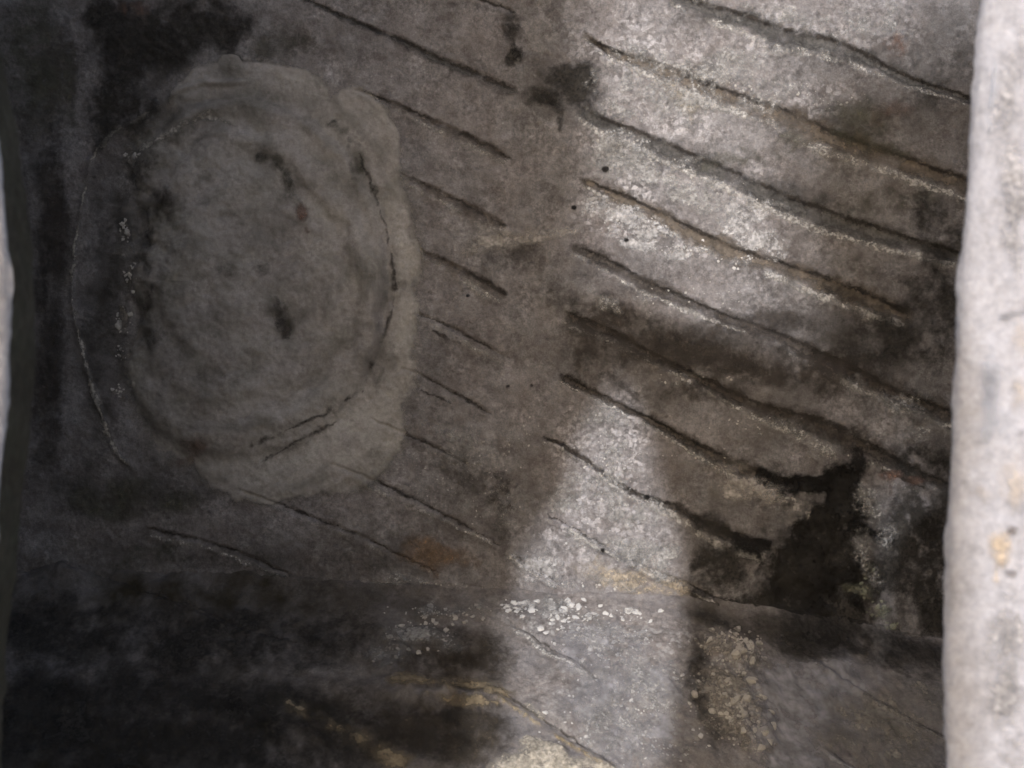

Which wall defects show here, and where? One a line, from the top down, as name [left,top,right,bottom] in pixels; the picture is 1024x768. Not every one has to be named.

leakage [2,0,76,462]
leakage [83,0,272,149]
leakage [505,15,522,66]
leakage [530,62,632,130]
leakage [609,45,776,121]
crack [581,179,911,327]
crack [578,105,961,267]
crack [587,37,968,202]
crack [674,0,971,104]
crack [560,310,950,500]
crack [572,246,952,428]
leakage [1,594,510,768]